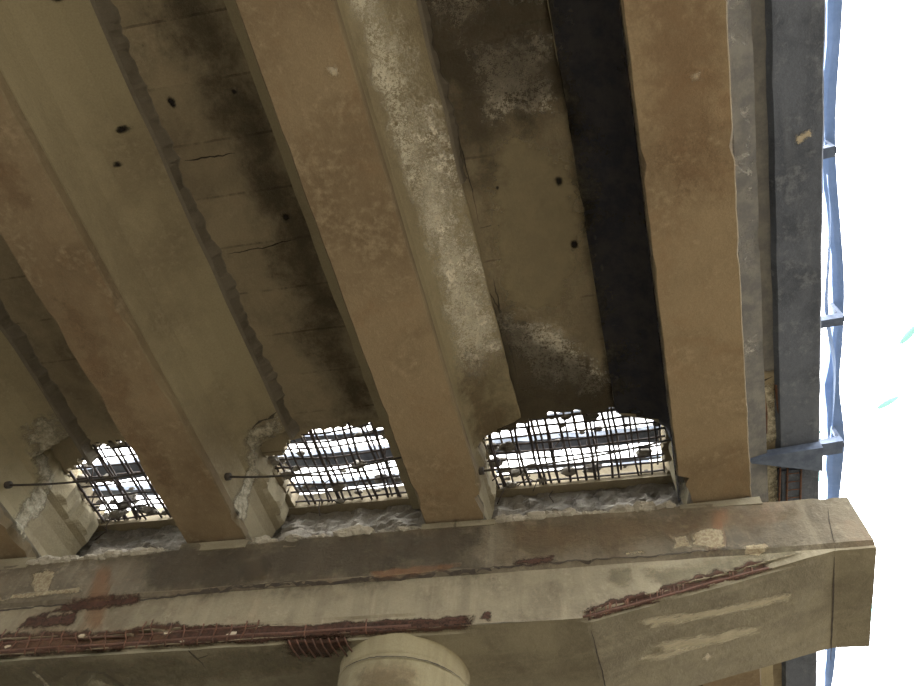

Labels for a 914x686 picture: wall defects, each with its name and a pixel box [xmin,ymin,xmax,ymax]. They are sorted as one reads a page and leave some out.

leakage [173,0,367,408]
leakage [350,0,686,503]
spalling [14,415,69,539]
spalling [67,440,172,540]
spalling [233,417,406,521]
spalling [483,420,669,504]
rust [17,594,140,629]
spalling [0,616,474,659]